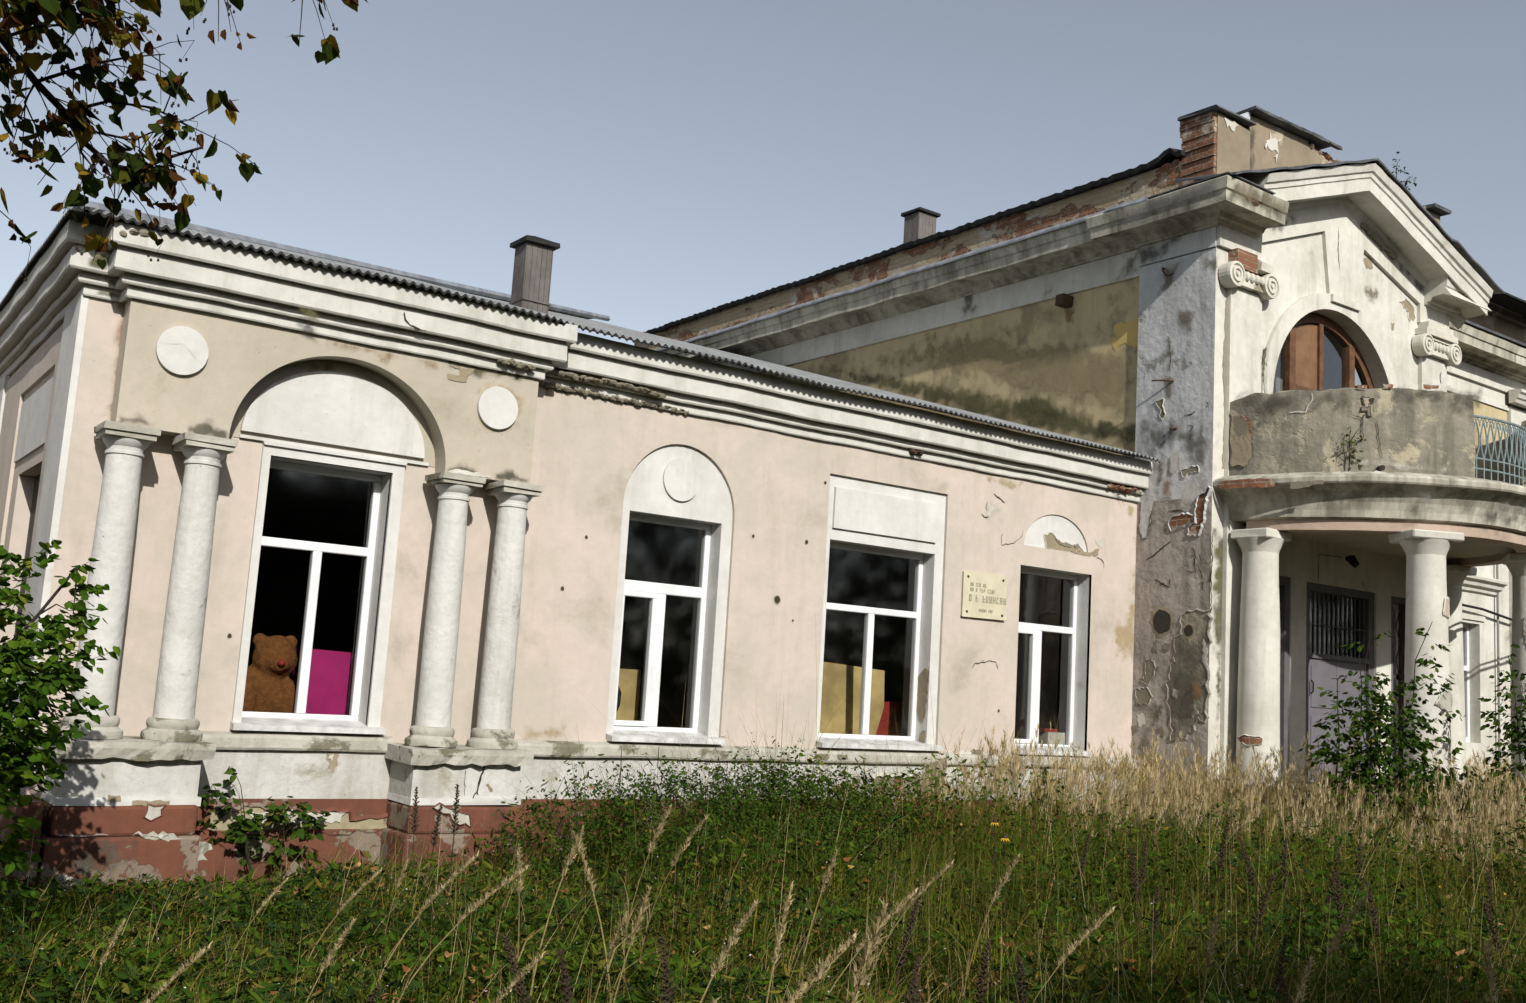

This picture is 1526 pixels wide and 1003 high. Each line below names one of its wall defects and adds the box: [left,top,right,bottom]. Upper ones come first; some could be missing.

water stain [1019,397,1056,415]
water stain [1248,393,1292,411]
peeling [1106,299,1341,539]
peeling [1044,532,1099,557]
spalling [432,802,471,827]
spalling [107,795,389,865]